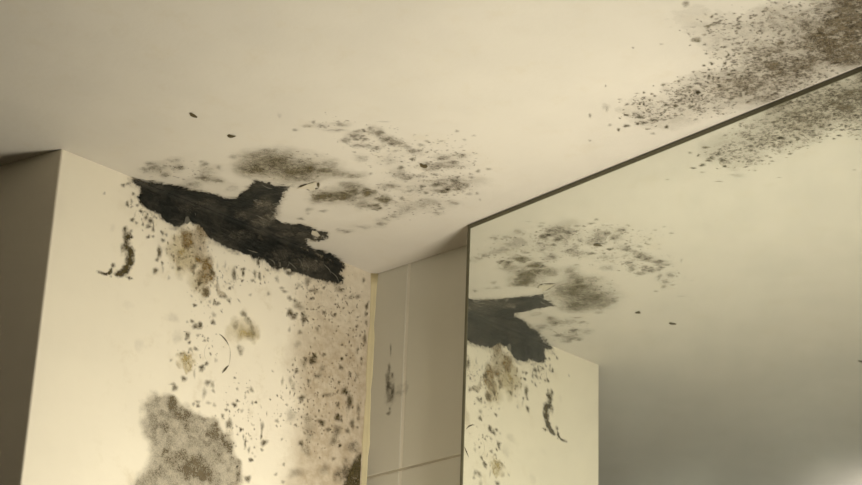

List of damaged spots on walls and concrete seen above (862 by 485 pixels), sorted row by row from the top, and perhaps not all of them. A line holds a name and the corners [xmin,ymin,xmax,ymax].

leakage [618,0,862,131]
leakage [245,156,332,177]
leakage [315,186,390,209]
leakage [103,193,222,312]
leakage [137,378,252,485]
leakage [336,454,361,485]